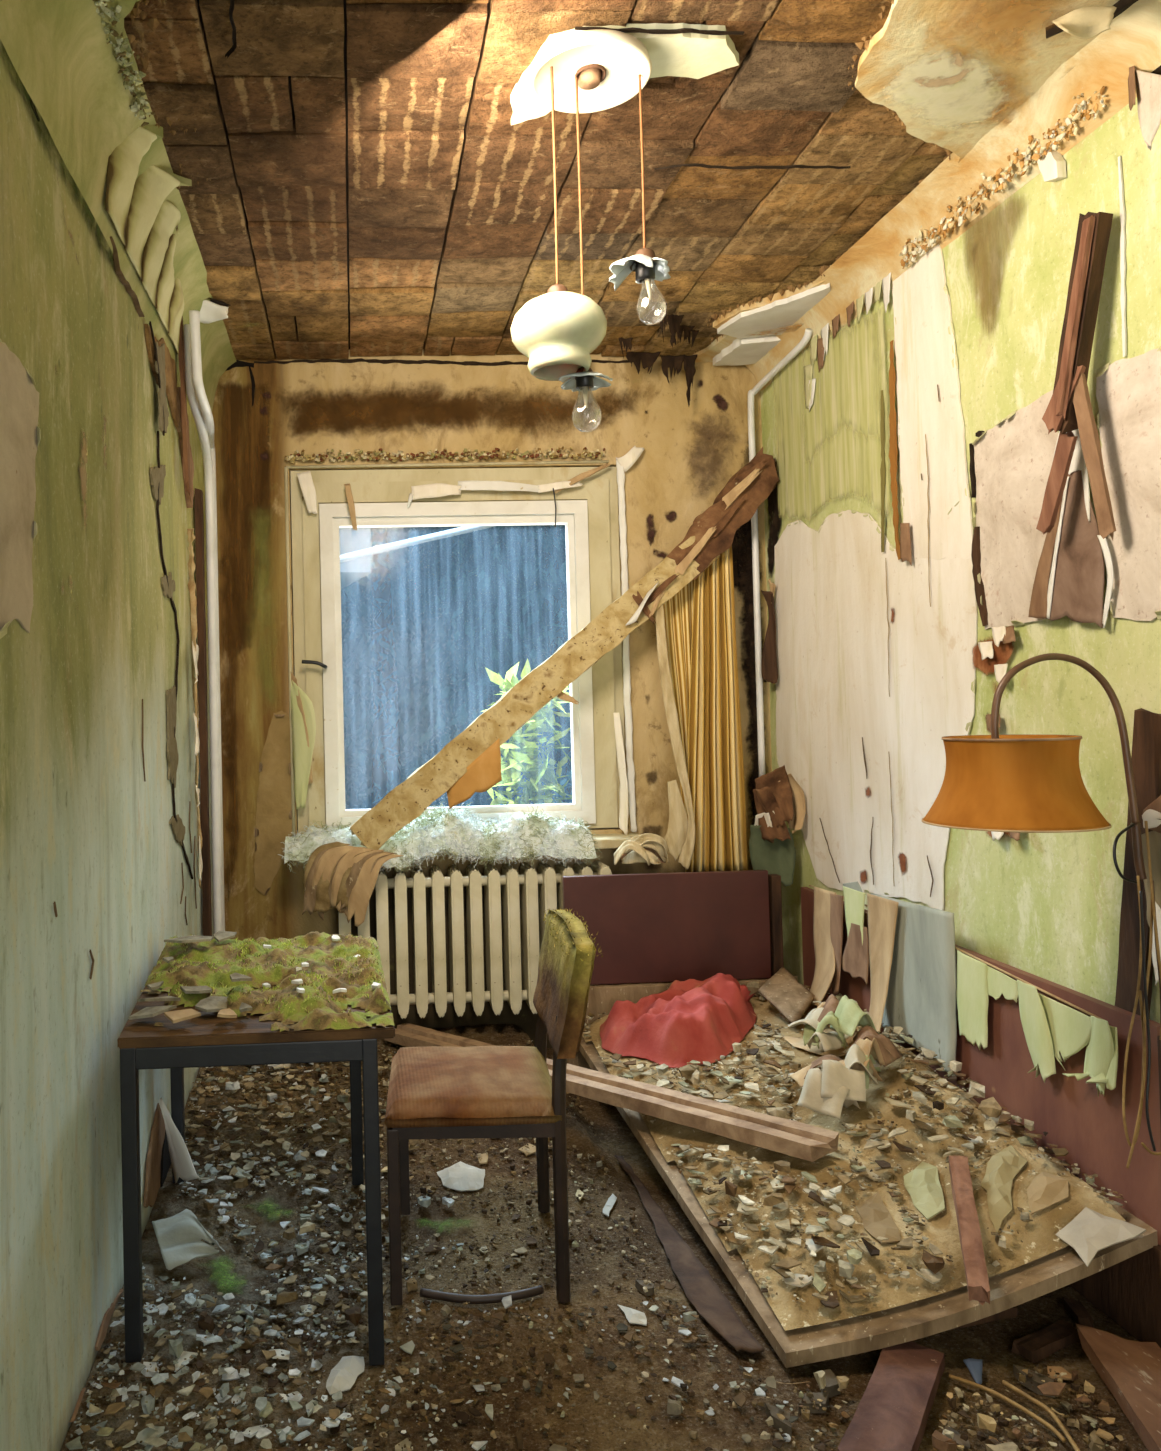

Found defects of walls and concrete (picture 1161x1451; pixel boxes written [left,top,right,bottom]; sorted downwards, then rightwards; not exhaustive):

peeling [1046,0,1138,39]
peeling [1128,65,1161,151]
peeling [0,339,41,639]
spalling [93,0,1106,1032]
water stain [647,511,676,558]
water stain [691,380,730,490]
water stain [220,384,647,899]
peeling [782,1033,857,1057]
peeling [955,947,1118,1097]